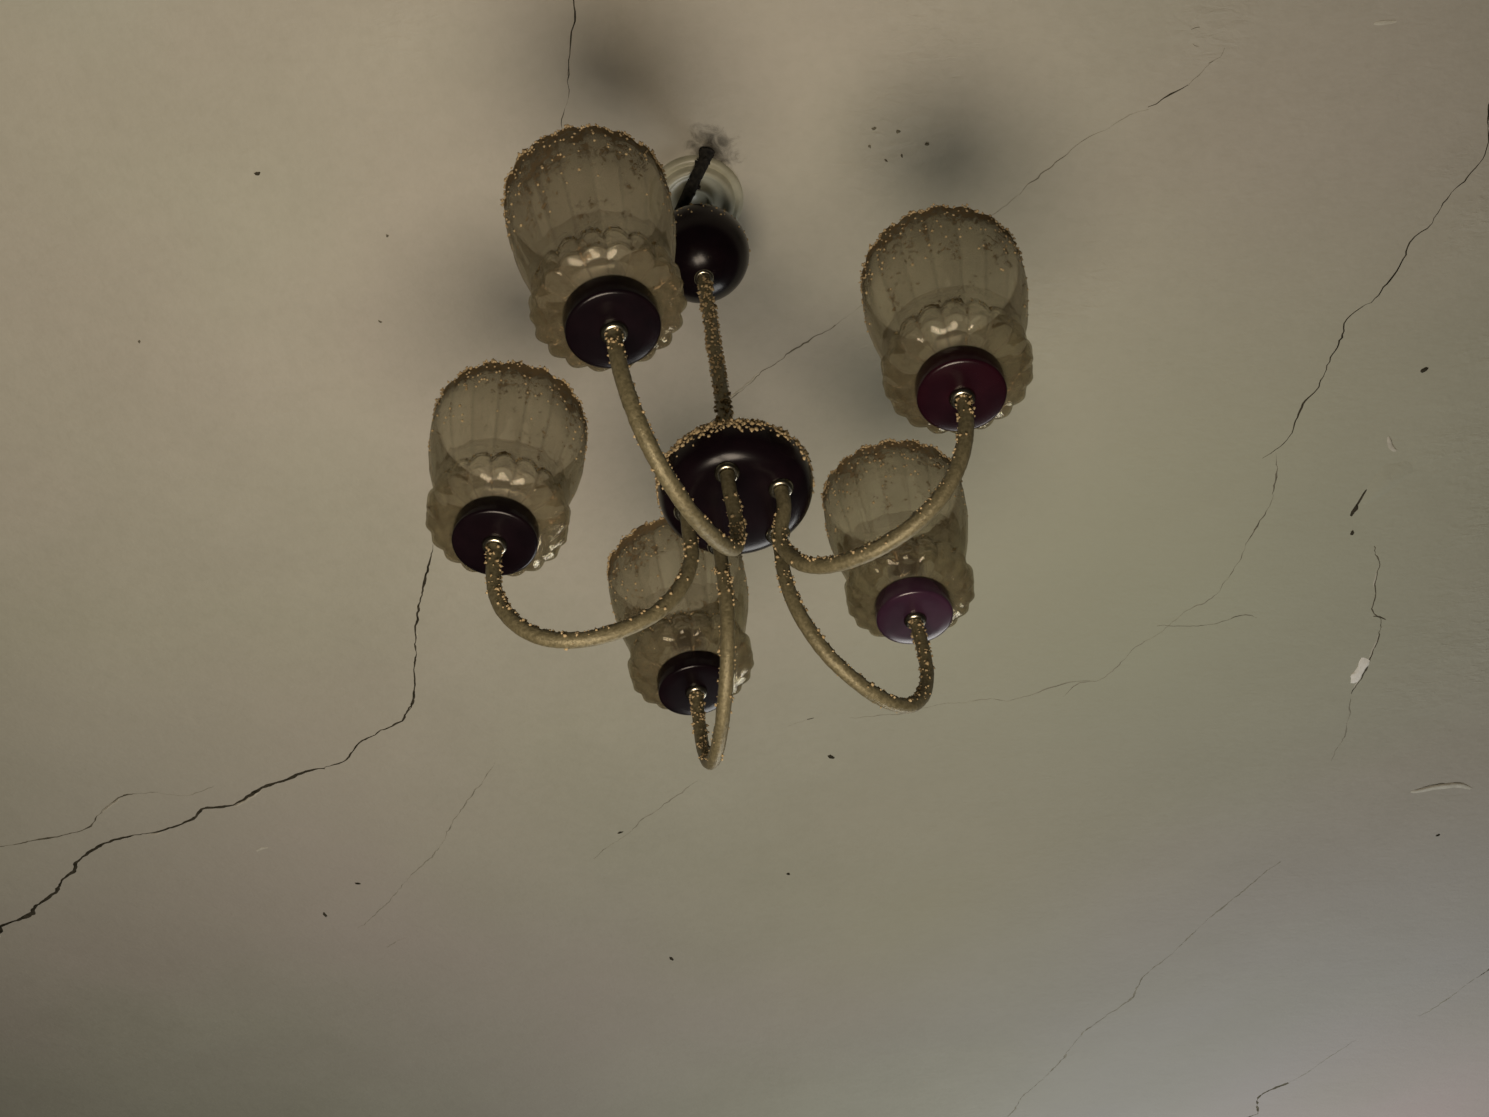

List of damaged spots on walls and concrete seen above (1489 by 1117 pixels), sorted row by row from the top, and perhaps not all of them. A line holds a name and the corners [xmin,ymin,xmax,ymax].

crack [561,0,576,127]
crack [711,27,1225,422]
crack [860,104,1489,718]
crack [0,550,433,937]
crack [1332,546,1386,758]
flaking render [1350,658,1370,683]
crack [1008,862,1280,1116]
crack [1249,1044,1349,1117]